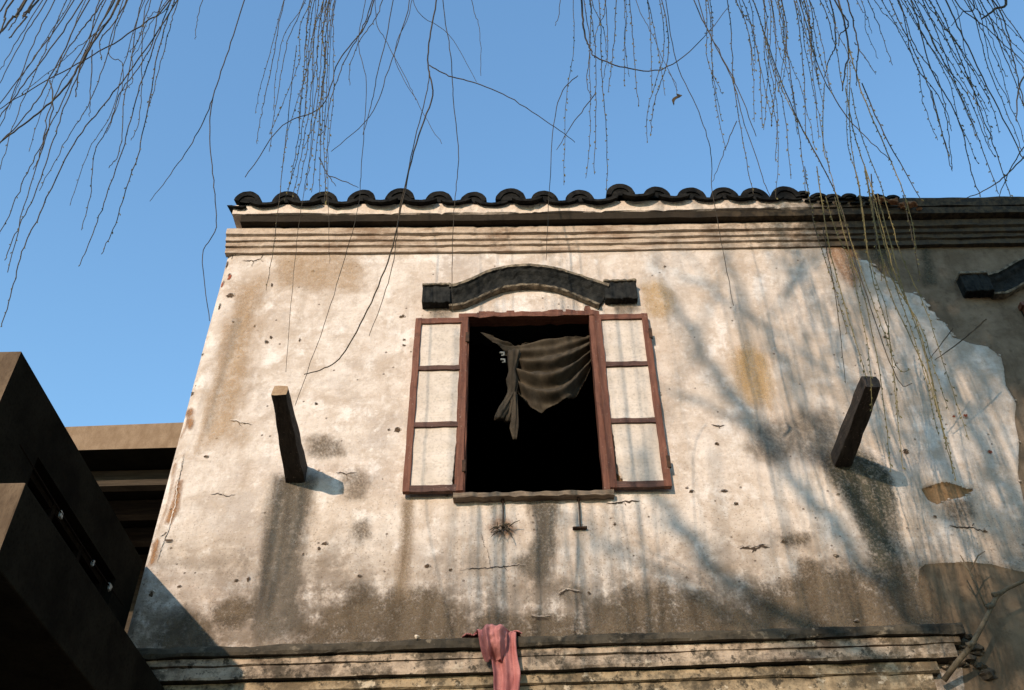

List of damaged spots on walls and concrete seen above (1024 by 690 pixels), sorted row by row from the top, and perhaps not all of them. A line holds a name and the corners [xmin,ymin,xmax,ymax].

flaking render [846,246,1024,499]
crack [157,452,185,560]
flaking render [922,482,973,518]
crack [462,534,528,570]
water stain [157,414,944,649]
crack [740,543,770,552]
crack [949,523,982,531]